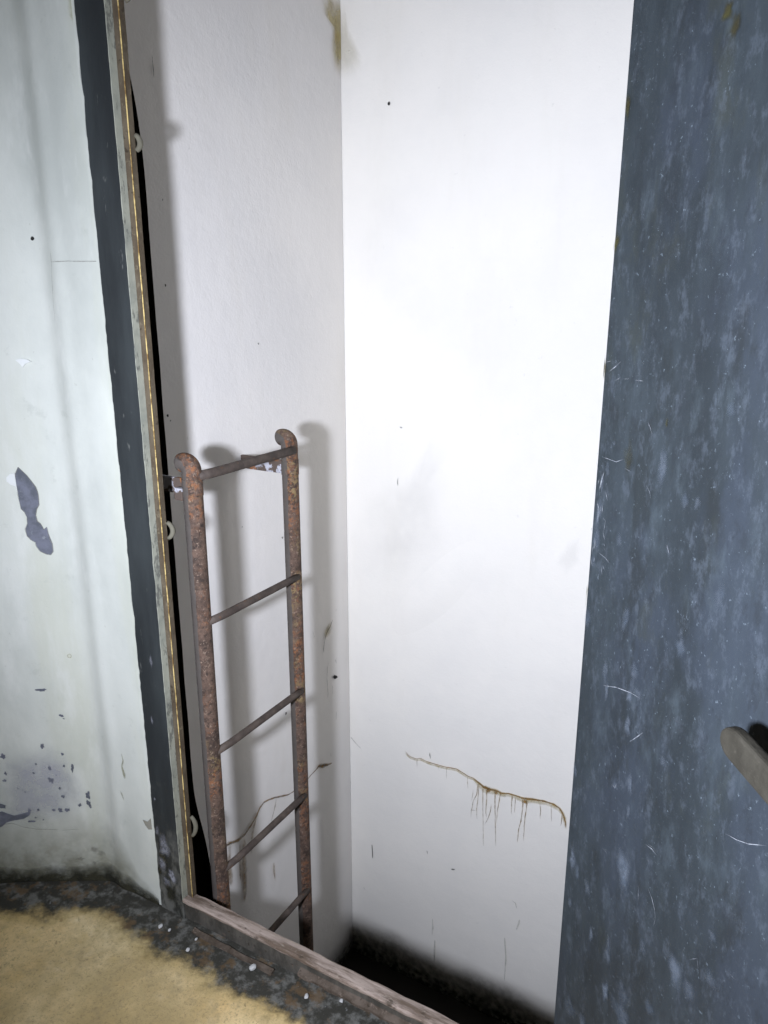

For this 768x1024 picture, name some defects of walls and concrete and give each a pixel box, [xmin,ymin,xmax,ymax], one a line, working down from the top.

peeling [6,467,53,555]
peeling [0,753,92,827]
crack [227,763,331,898]
crack [412,757,566,842]
damp [0,858,162,907]
damp [335,935,540,1024]